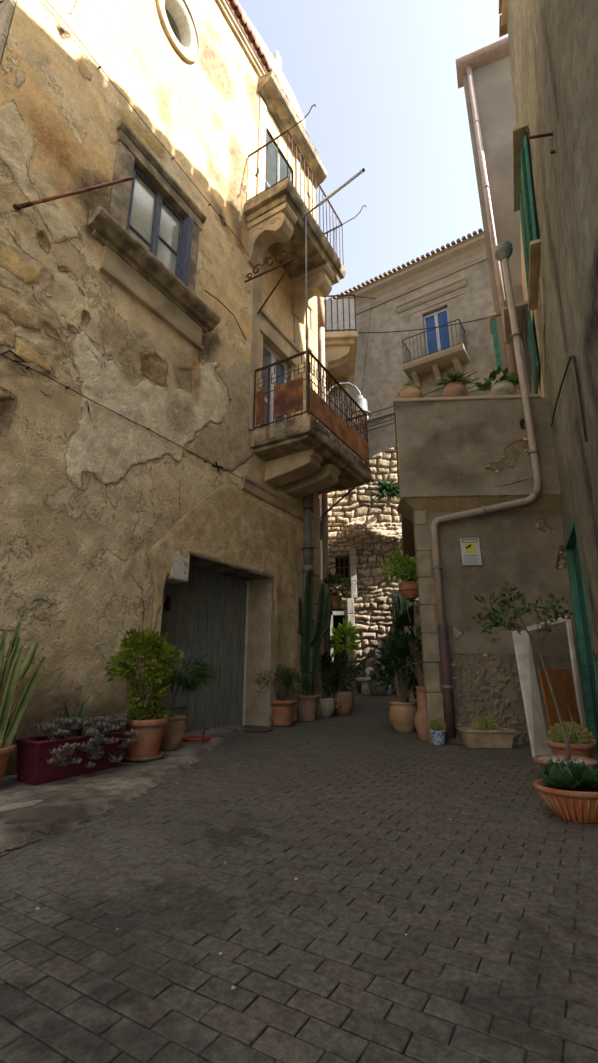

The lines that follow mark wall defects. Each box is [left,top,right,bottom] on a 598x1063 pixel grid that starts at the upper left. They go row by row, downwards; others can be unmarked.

flaking render [0,99,232,490]
spalling [486,418,528,472]
crack [0,598,63,631]